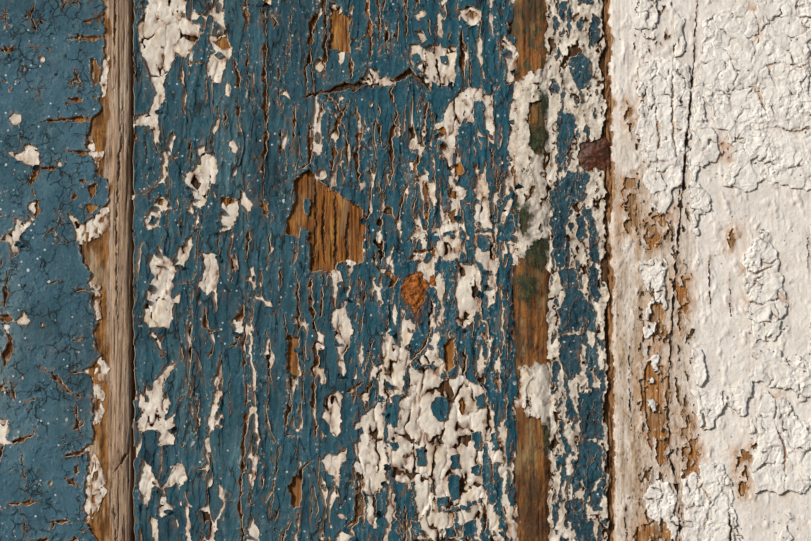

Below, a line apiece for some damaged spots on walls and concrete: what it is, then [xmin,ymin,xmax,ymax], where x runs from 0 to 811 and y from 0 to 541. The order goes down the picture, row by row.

crack [0,435,34,531]
crack [41,115,85,123]
peeling [131,350,187,518]
peeling [133,0,232,230]
peeling [140,197,240,353]
crack [298,268,326,440]
crack [224,0,502,352]
rust [400,271,437,322]
peeling [319,0,604,541]
crack [666,5,698,541]
peeling [621,0,811,343]
peeling [633,228,811,541]